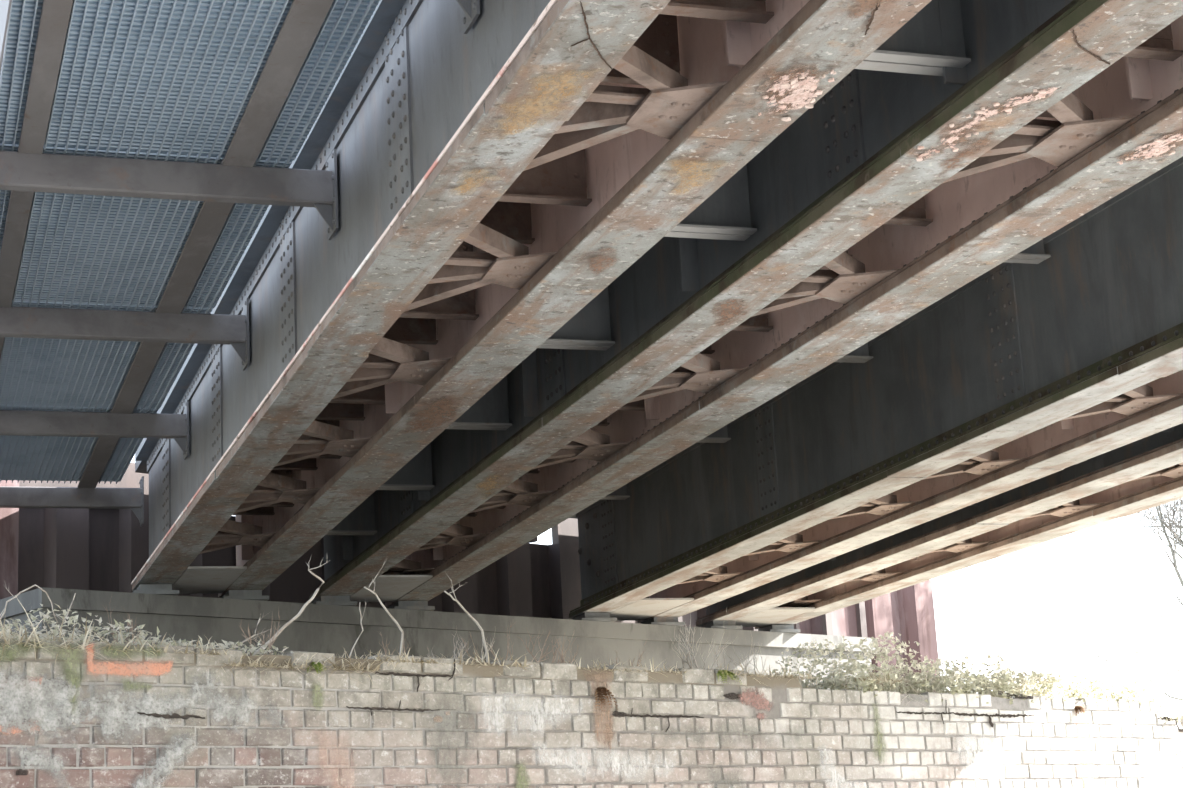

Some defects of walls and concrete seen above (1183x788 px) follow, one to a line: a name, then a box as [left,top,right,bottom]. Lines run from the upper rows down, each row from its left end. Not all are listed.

crack [1073,29,1110,65]
peeling [757,65,836,122]
peeling [916,87,1057,161]
peeling [1117,131,1183,164]
crack [346,659,455,716]
crack [626,708,704,732]
crack [897,701,1034,727]
crack [1158,716,1183,732]